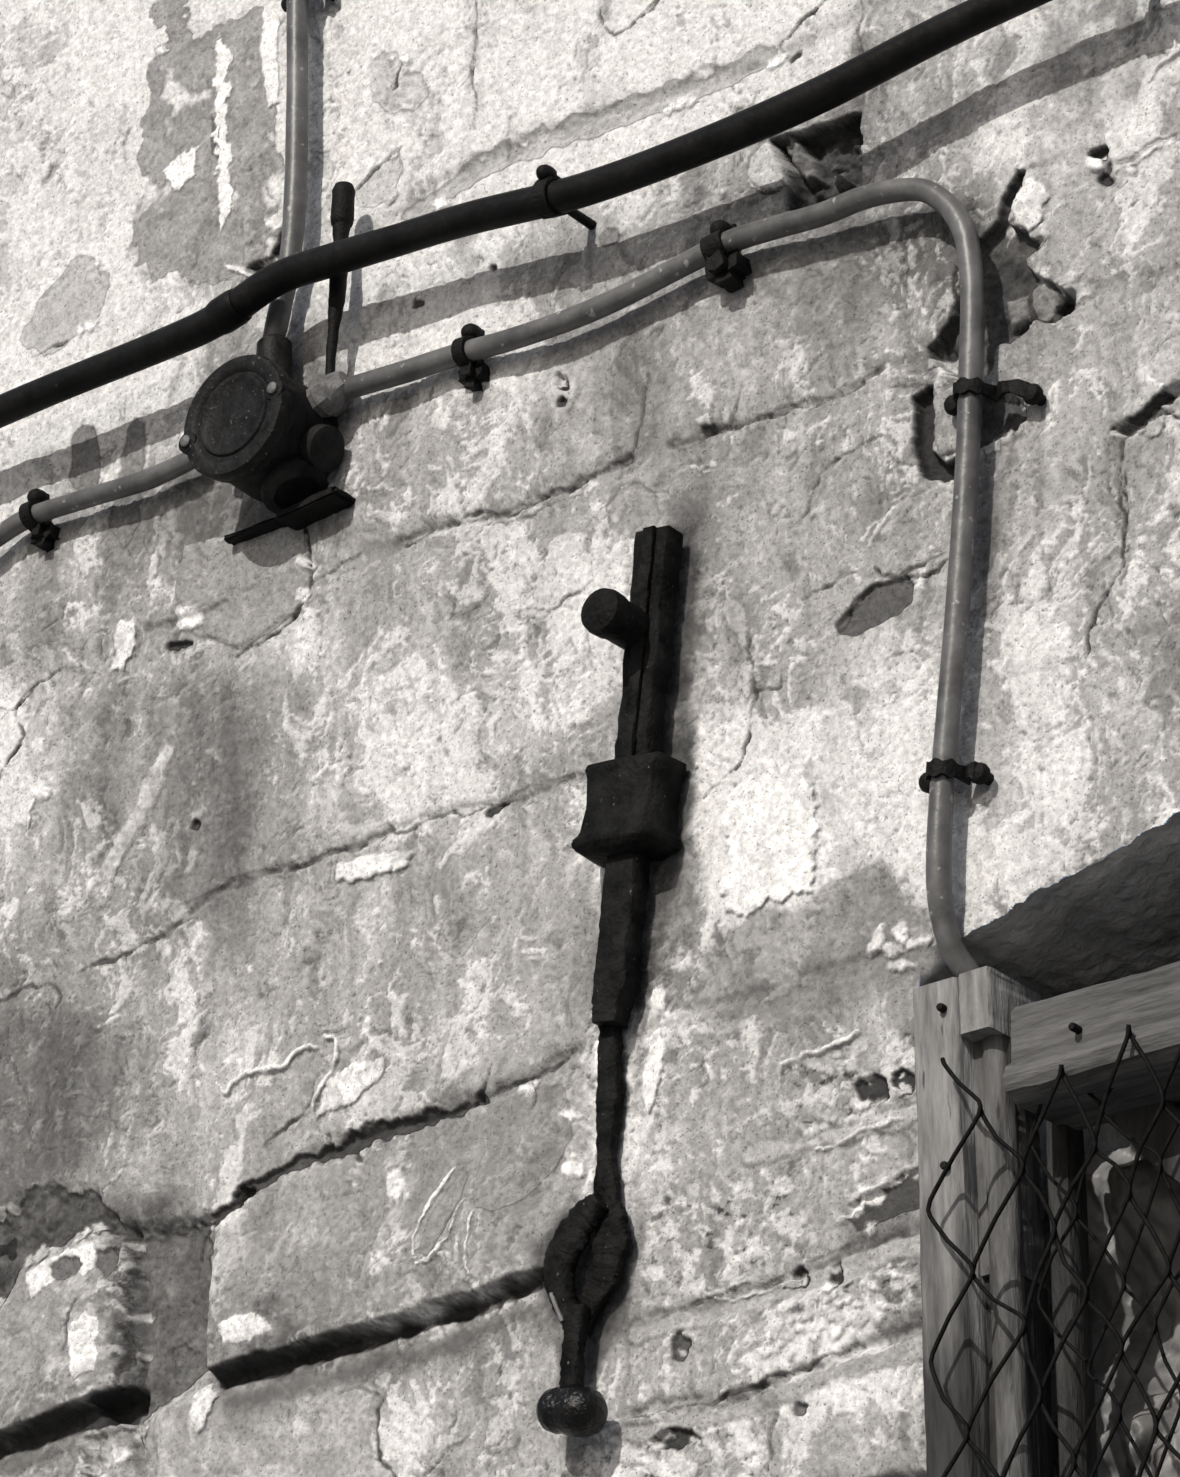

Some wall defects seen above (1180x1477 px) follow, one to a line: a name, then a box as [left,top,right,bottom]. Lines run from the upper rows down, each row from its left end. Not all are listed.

spalling [747,115,863,210]
spalling [980,132,1093,377]
spalling [913,264,960,483]
spalling [980,393,1027,455]
spalling [835,559,948,637]
crack [1087,458,1129,654]
crack [0,773,575,1008]
crack [212,1048,577,1227]
spalling [0,1184,217,1477]
crack [208,1277,544,1477]